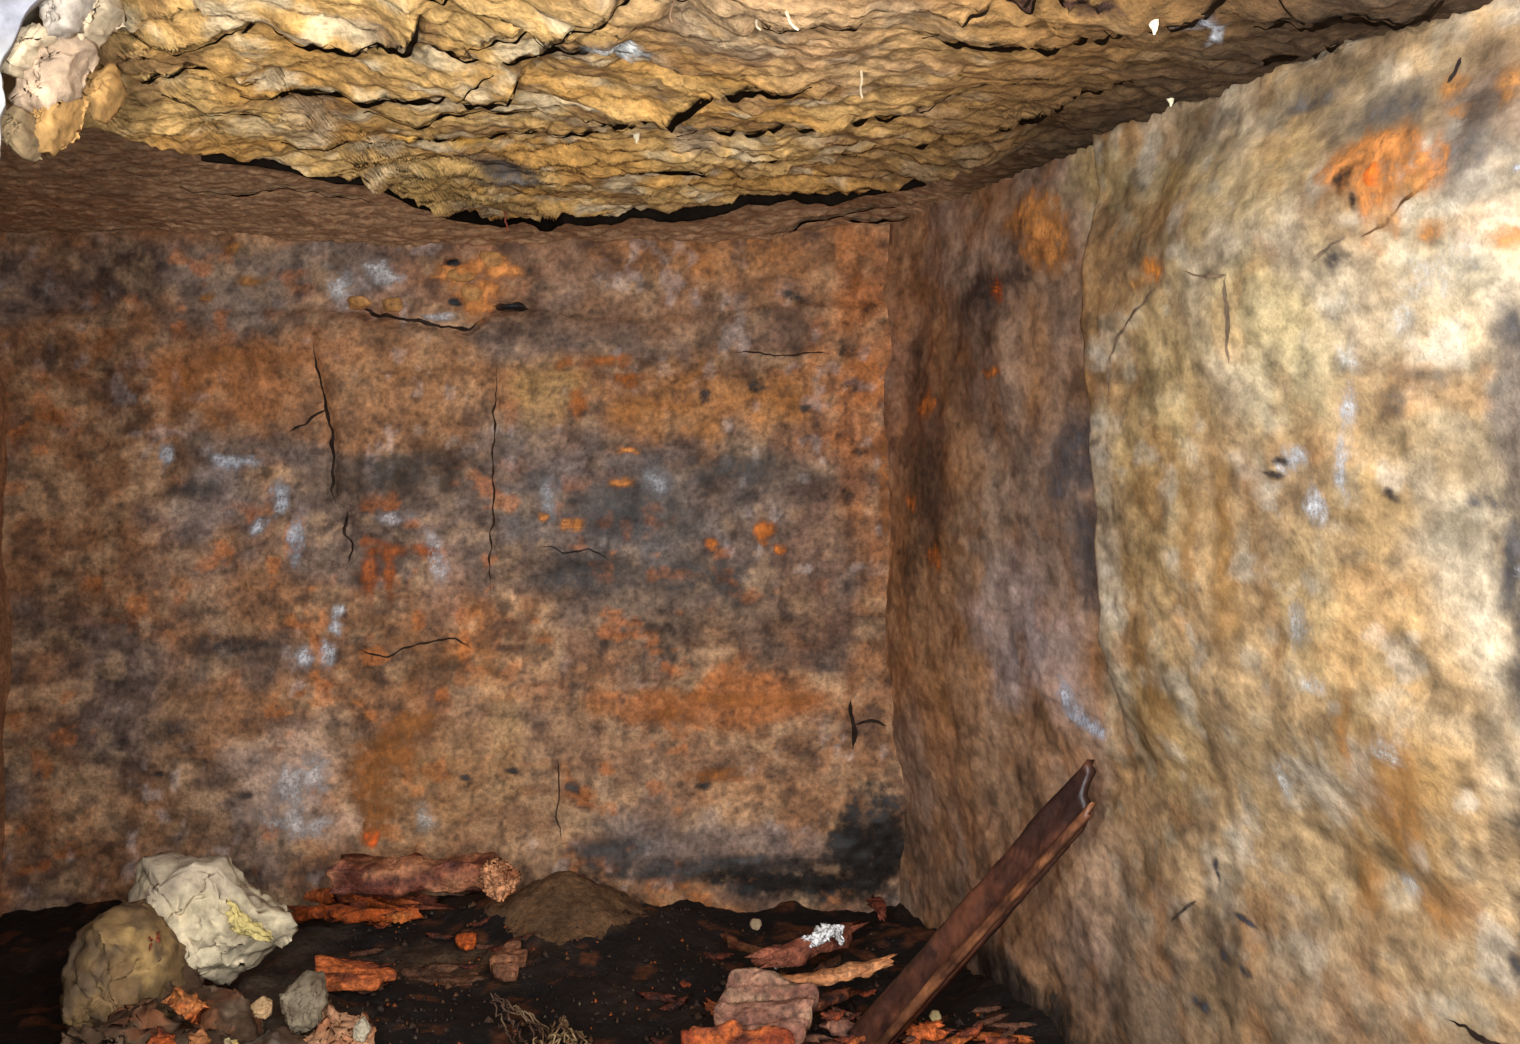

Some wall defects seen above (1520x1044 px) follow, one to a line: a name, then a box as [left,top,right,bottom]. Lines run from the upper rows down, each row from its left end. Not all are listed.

rust [1318,128,1450,224]
crack [364,302,529,331]
crack [1107,271,1230,396]
crack [289,338,354,564]
crack [488,369,497,589]
crack [1445,1018,1500,1044]